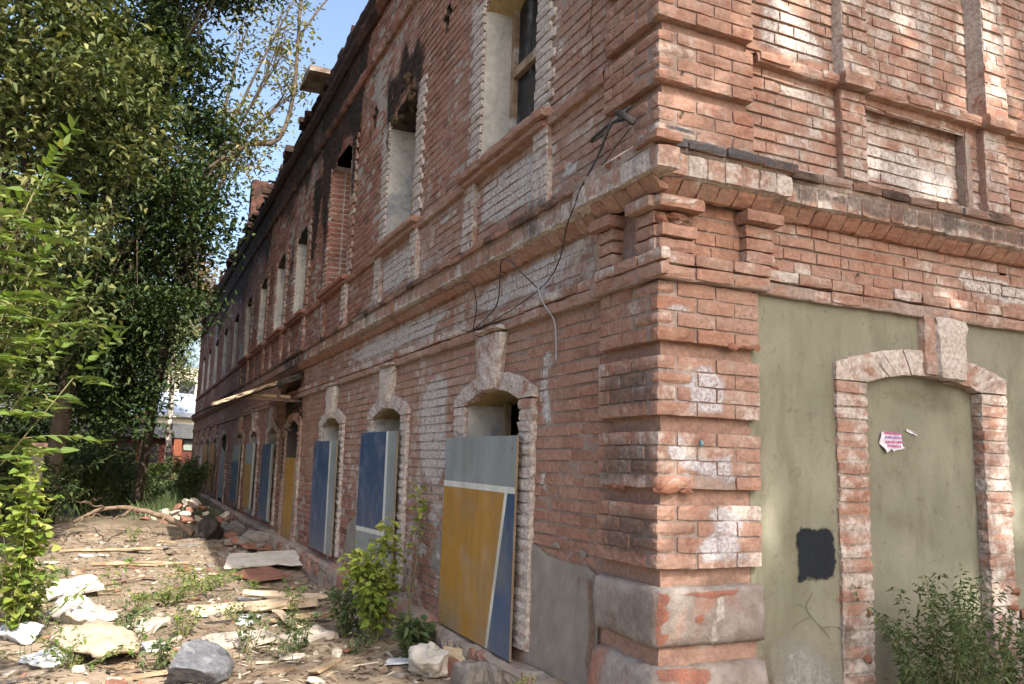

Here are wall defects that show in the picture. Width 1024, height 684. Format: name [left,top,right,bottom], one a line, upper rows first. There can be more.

leakage [311,178,328,283]
spalling [687,589,738,598]
spalling [656,594,670,646]
spalling [656,668,711,684]